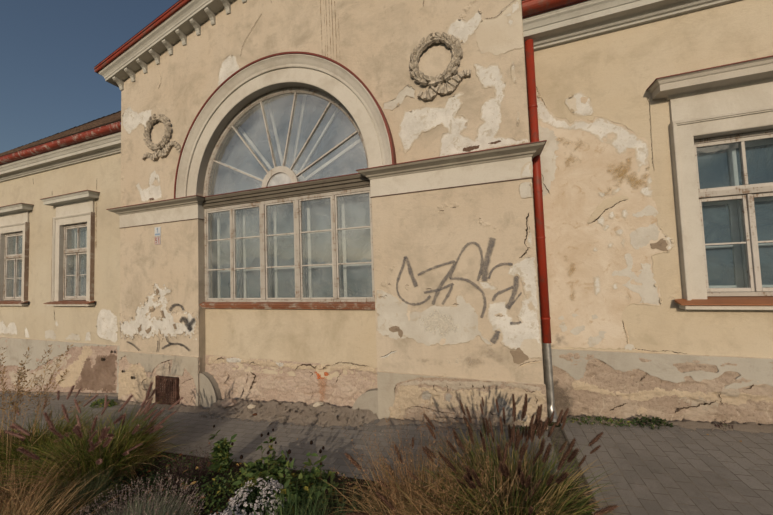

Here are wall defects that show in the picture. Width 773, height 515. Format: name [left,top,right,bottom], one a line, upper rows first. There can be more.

peeling [122,106,152,135]
peeling [136,169,163,203]
peeling [375,0,773,429]
spalling [0,282,200,407]